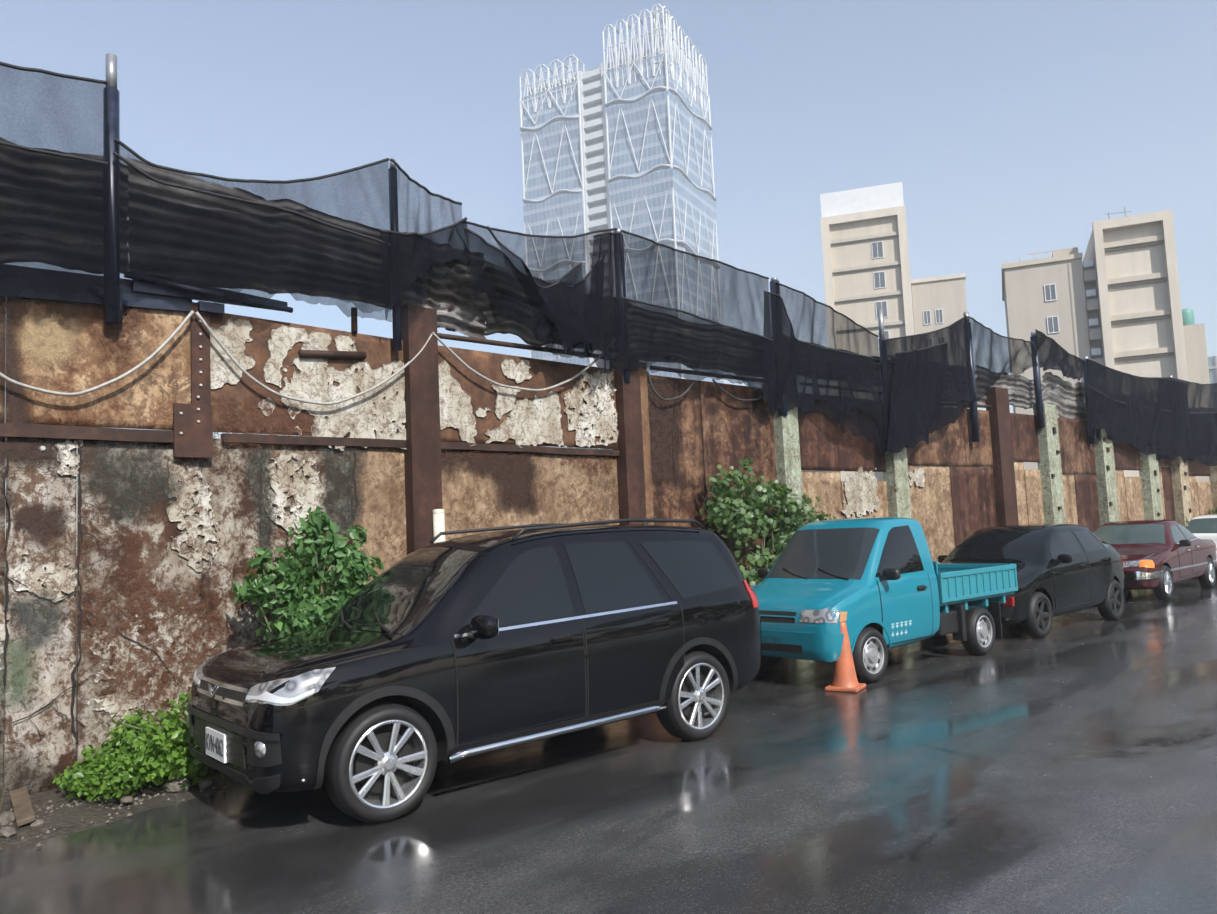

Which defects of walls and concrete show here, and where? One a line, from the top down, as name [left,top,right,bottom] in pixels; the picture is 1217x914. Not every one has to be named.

crack [0,448,28,690]
peeling [6,545,77,602]
corrosion [0,297,145,463]
crack [14,441,184,742]
corrosion [0,493,201,564]
water stain [88,445,175,518]
corrosion [73,574,235,712]
peeling [166,460,221,572]
peeling [261,449,326,534]
peeling [210,318,406,451]
peeling [438,359,618,448]
corrosion [647,378,680,483]